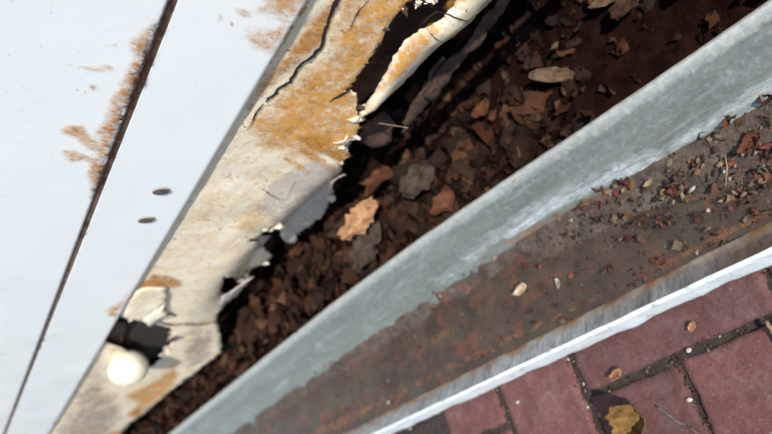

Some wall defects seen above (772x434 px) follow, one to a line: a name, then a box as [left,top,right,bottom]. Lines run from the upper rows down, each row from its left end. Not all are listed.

crack [416,0,470,43]
rust [63,0,174,198]
crack [248,0,339,129]
rust [249,0,510,175]
peeling [346,0,492,123]
peeling [227,134,361,254]
peeling [337,197,379,241]
peeling [123,287,169,327]
rust [142,275,180,288]
peeling [219,261,270,308]
peeling [158,329,178,357]
rust [127,369,178,417]